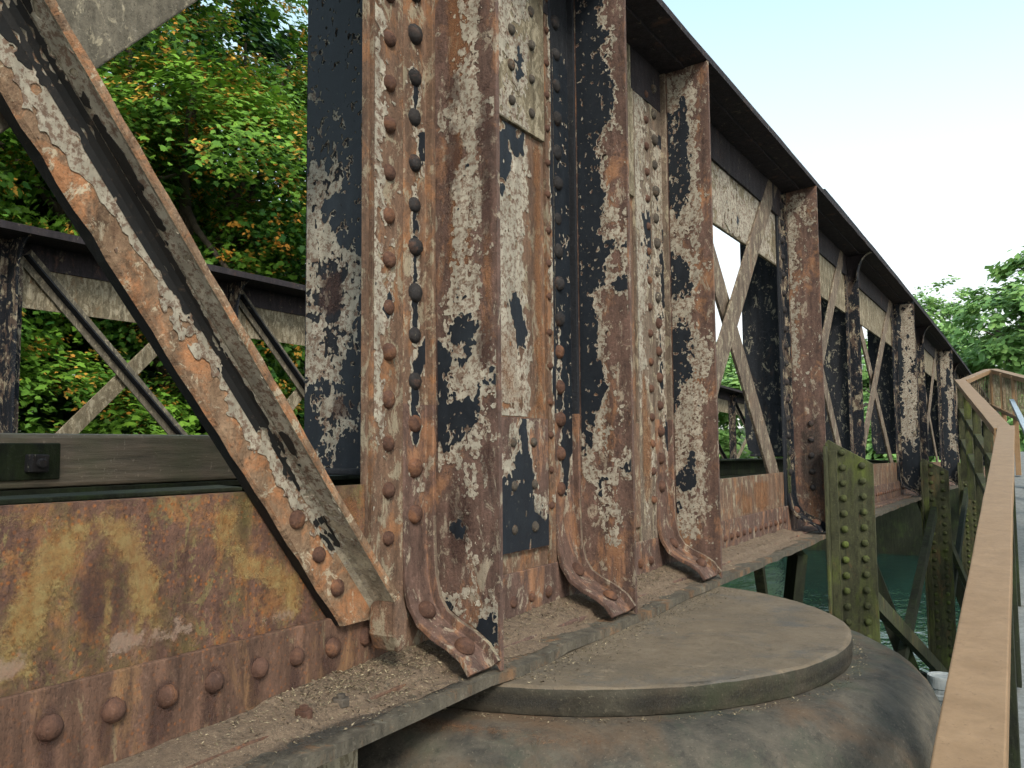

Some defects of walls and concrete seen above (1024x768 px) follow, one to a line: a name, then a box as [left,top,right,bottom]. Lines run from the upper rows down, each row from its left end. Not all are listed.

peeling [0,0,425,567]
peeling [405,0,759,653]
peeling [759,193,821,392]
peeling [896,304,921,488]
peeling [939,351,957,481]
corrosion [0,518,160,683]
corrosion [214,512,299,619]